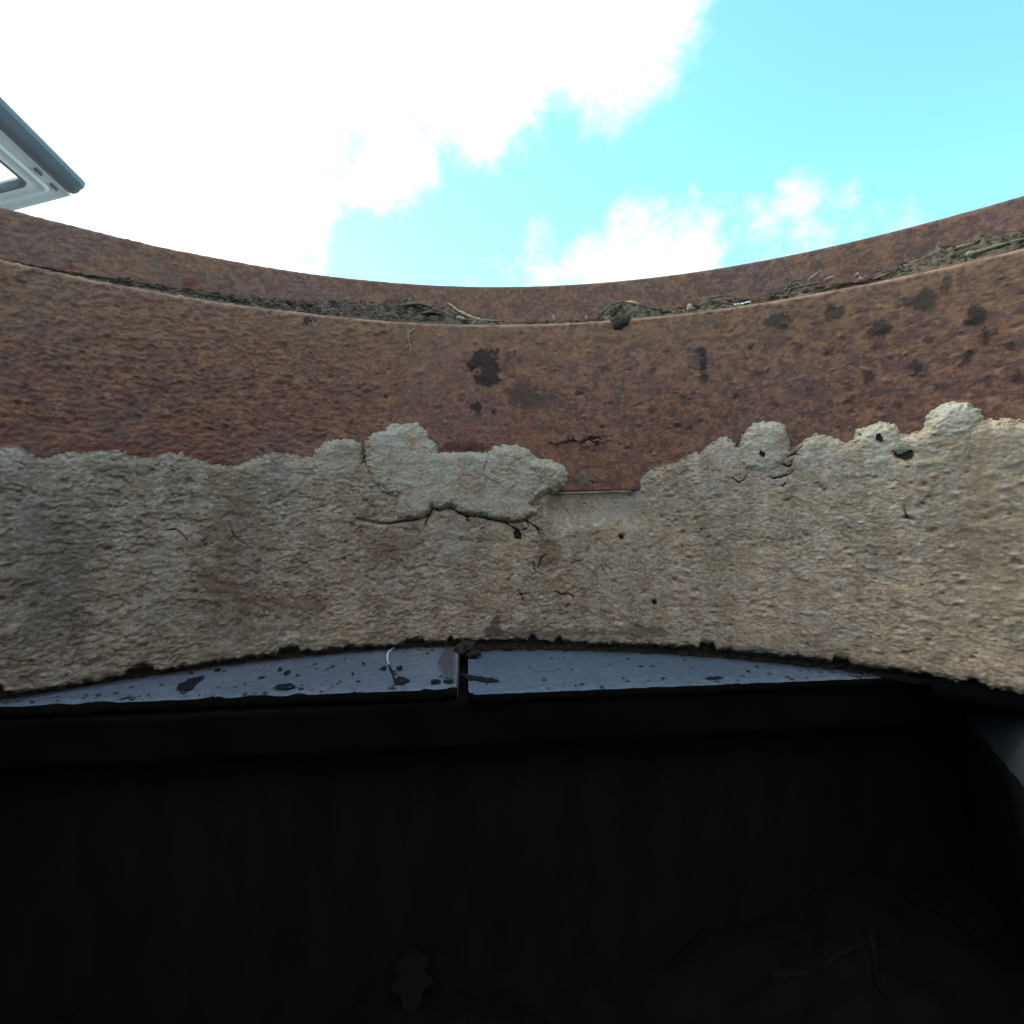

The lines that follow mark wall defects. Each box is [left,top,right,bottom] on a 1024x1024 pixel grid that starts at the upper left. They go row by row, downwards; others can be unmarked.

rust [762,311,794,333]
rust [825,303,845,321]
rust [866,318,893,348]
rust [903,277,953,312]
rust [959,305,1014,366]
rust [462,347,501,387]
rust [695,347,708,382]
rust [439,439,489,452]
rust [548,435,612,446]
peeling [394,451,569,522]
crack [364,507,545,600]